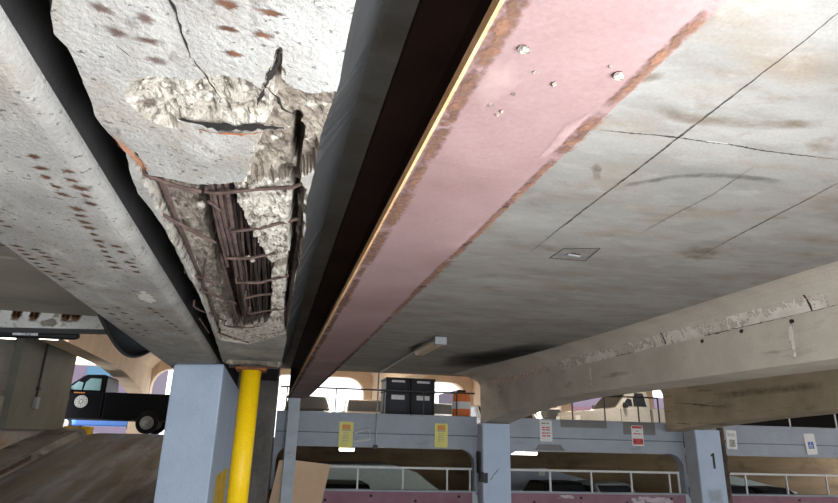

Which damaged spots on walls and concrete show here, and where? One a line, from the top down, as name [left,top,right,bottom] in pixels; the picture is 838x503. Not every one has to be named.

rust [217,0,239,9]
crack [168,0,221,98]
rust [609,13,705,102]
crack [178,47,296,136]
rust [121,144,143,166]
crack [605,130,830,159]
rust [28,154,139,273]
spalling [123,49,334,344]
rust [11,245,81,284]
rust [11,311,40,321]
peeling [628,293,829,353]